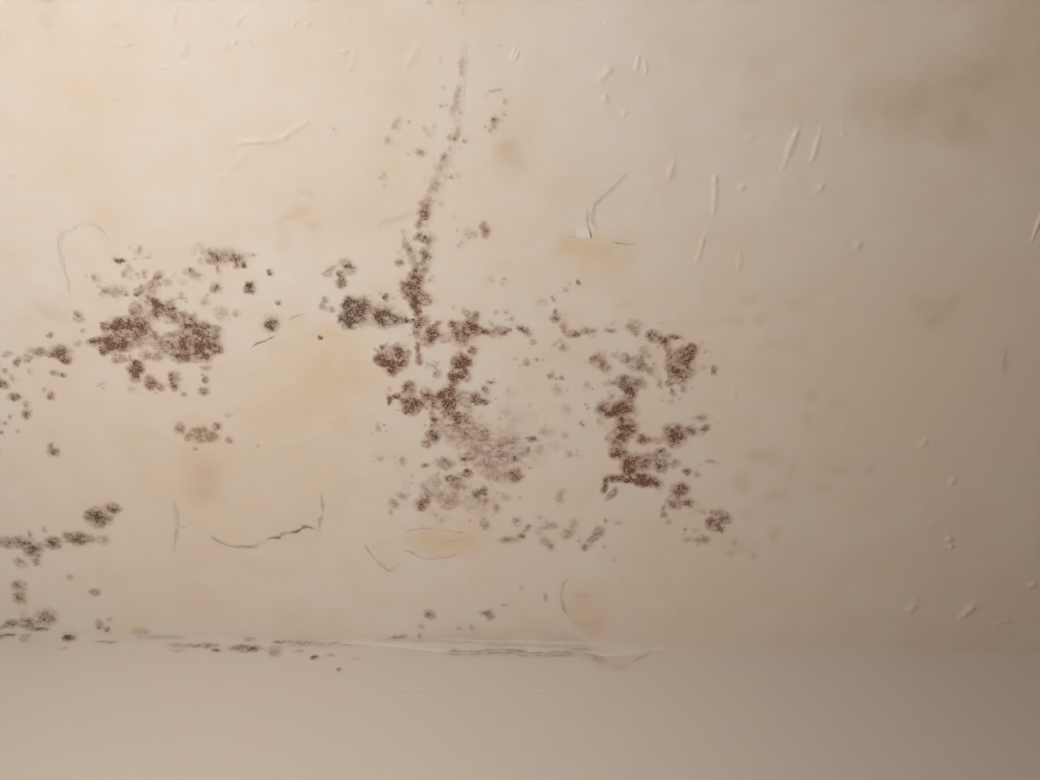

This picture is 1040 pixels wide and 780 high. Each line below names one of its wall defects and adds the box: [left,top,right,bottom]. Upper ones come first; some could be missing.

crack [563,170,637,245]
water stain [0,240,274,439]
water stain [257,298,284,337]
water stain [317,39,817,574]
water stain [44,441,63,459]
water stain [171,412,241,514]
water stain [0,500,152,650]
crack [172,493,325,555]